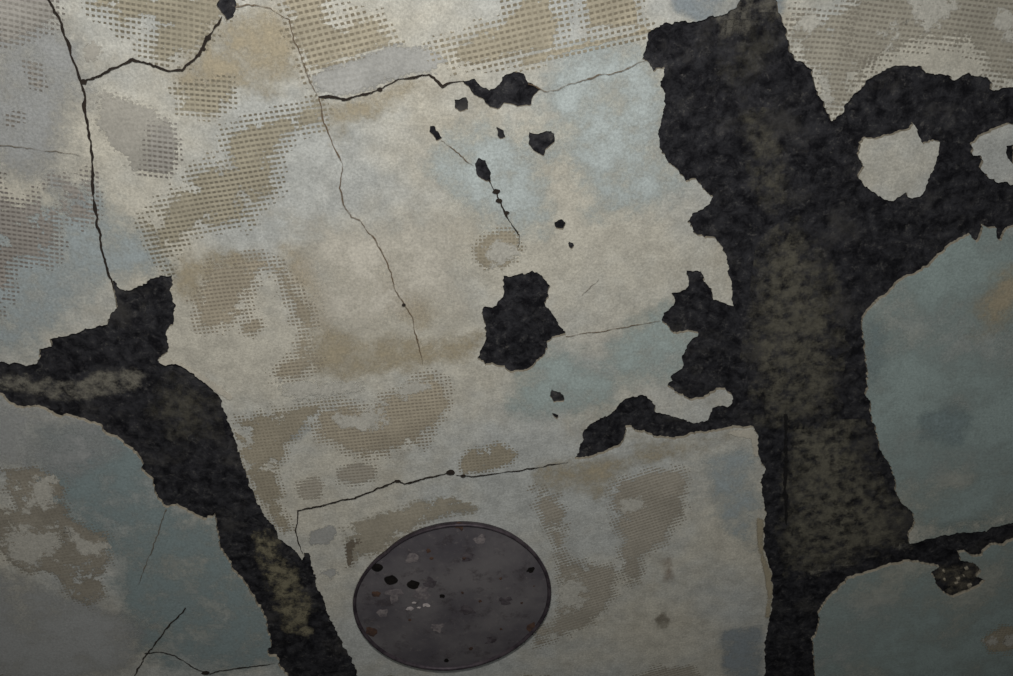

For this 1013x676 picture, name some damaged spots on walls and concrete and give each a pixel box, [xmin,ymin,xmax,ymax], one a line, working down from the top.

peeling [0,0,65,49]
peeling [83,0,239,70]
peeling [22,60,48,92]
peeling [168,75,238,122]
crack [528,60,646,92]
crack [0,0,461,364]
crack [441,140,520,246]
crack [566,321,657,337]
spalling [277,0,1013,676]
spalling [0,89,455,676]
crack [295,462,568,554]